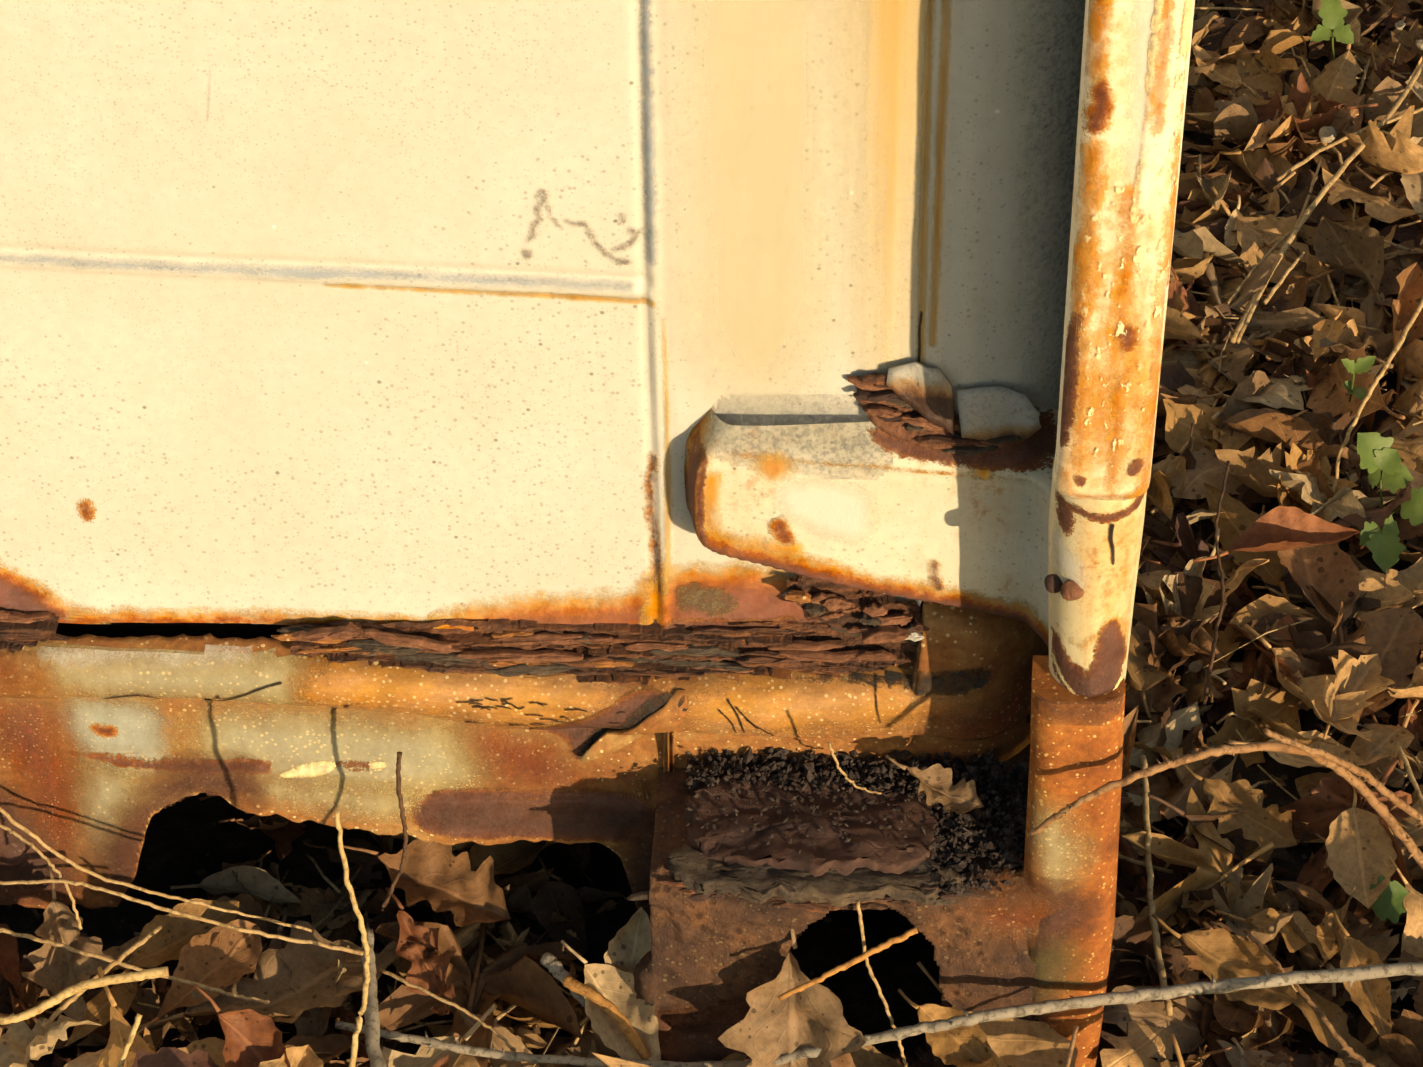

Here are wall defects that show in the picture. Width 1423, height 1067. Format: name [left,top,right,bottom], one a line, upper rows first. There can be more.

corrosion [742,0,1165,537]
corrosion [1146,0,1184,286]
corrosion [0,345,1049,924]
peeling [677,583,738,617]
peeling [905,632,924,642]
corrosion [1027,881,1094,1029]